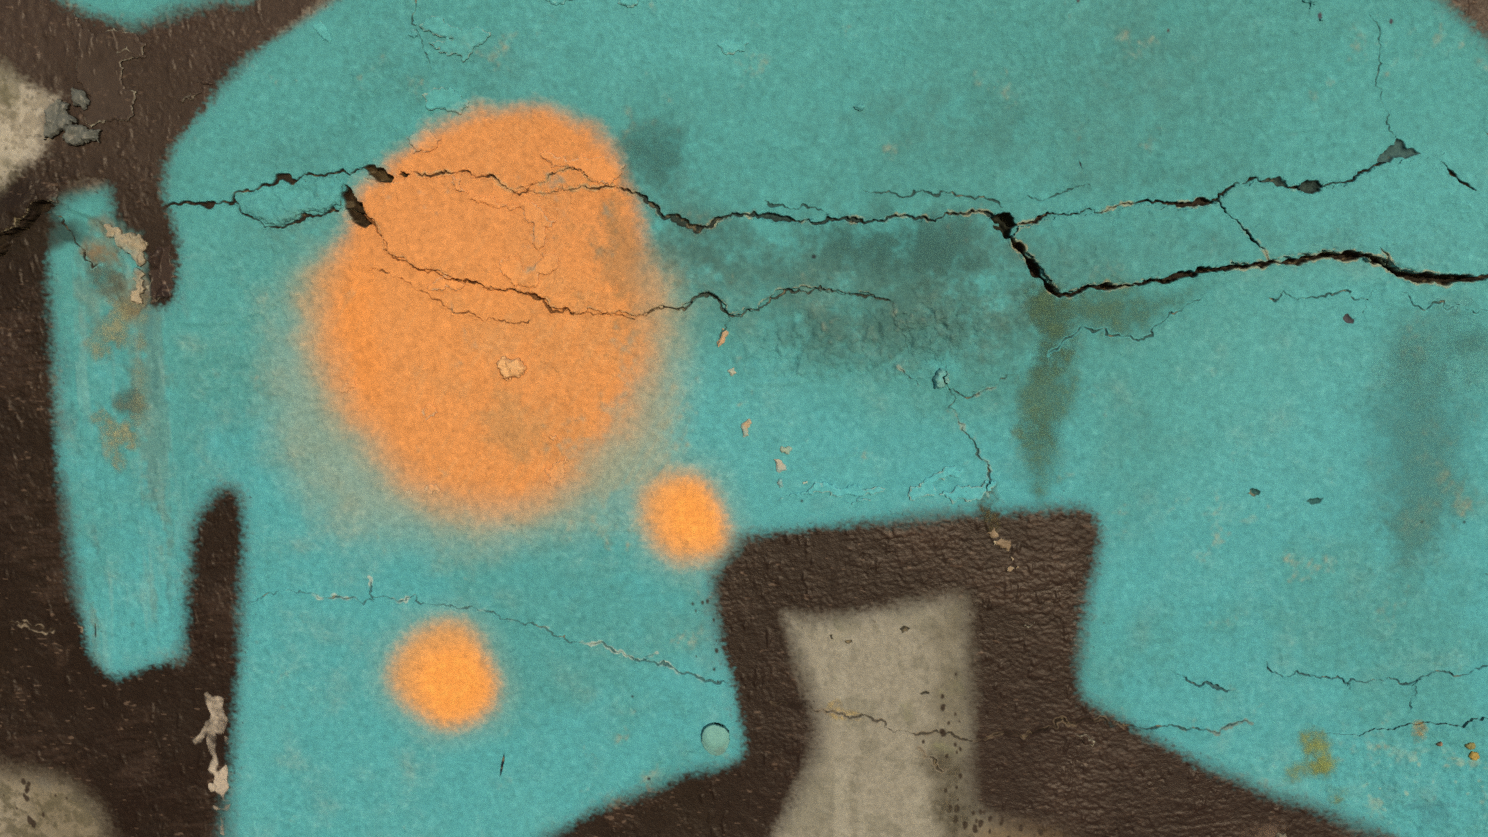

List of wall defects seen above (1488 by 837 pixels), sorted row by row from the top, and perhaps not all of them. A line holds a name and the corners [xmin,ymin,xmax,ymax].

peeling [408,16,491,62]
peeling [43,13,147,146]
peeling [540,150,626,185]
crack [0,197,105,272]
flaking render [104,224,176,304]
crack [163,165,897,349]
crack [409,9,1488,499]
peeling [774,446,885,505]
peeling [908,466,996,504]
crack [244,575,734,688]
crack [769,659,1488,775]